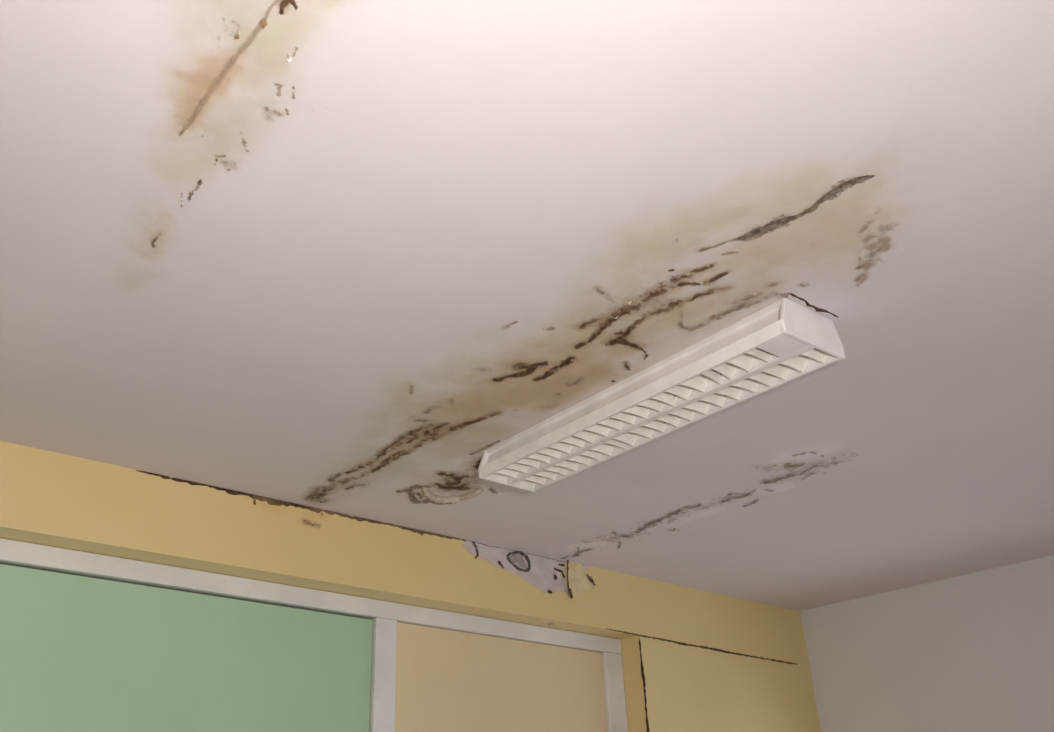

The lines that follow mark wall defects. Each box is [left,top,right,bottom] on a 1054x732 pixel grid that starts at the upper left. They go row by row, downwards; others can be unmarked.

crack [179,0,280,136]
water stain [83,0,411,312]
crack [699,174,877,255]
water stain [257,92,1015,510]
crack [136,470,593,562]
peeling [303,409,501,526]
crack [612,452,819,549]
flaking render [463,540,596,599]
crack [606,628,798,732]